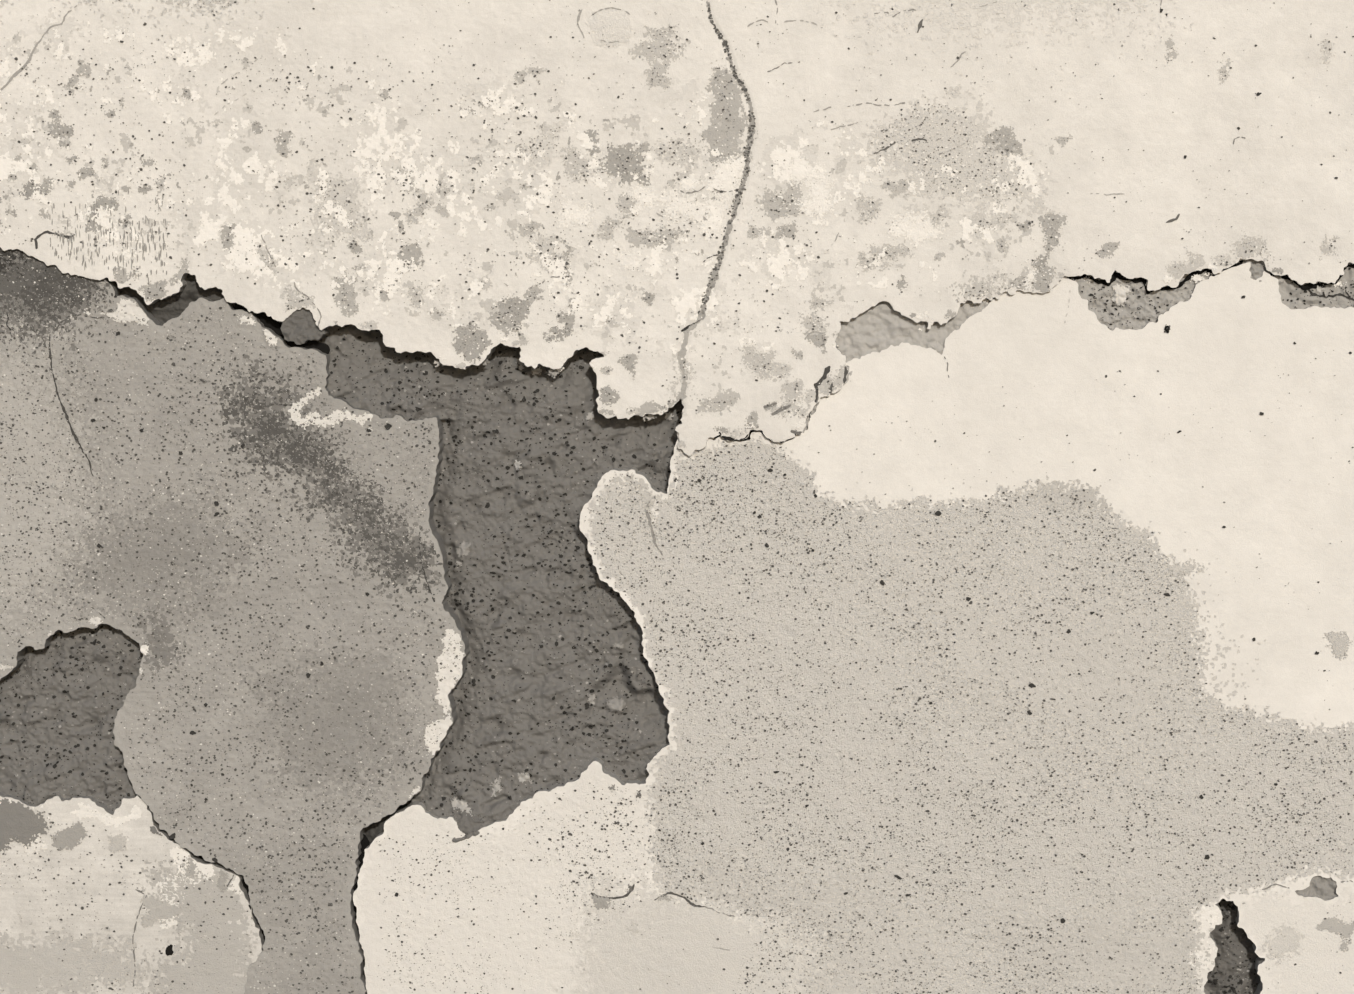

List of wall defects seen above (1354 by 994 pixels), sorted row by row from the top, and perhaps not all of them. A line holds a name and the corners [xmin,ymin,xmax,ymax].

crack [874,9,923,33]
crack [657,0,823,414]
crack [714,366,848,443]
crack [198,856,265,942]
crack [353,834,370,976]